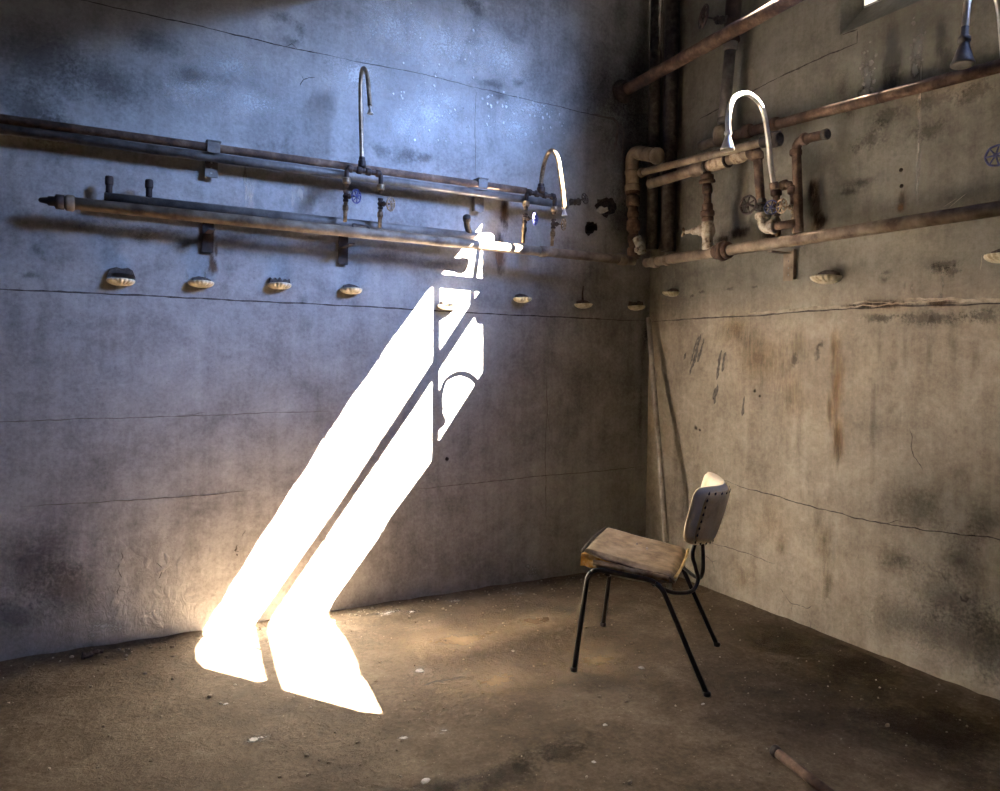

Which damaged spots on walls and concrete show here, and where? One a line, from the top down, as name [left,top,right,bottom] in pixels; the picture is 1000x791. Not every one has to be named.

spalling [585,197,617,236]
crack [0,289,1000,322]
crack [724,480,1000,540]